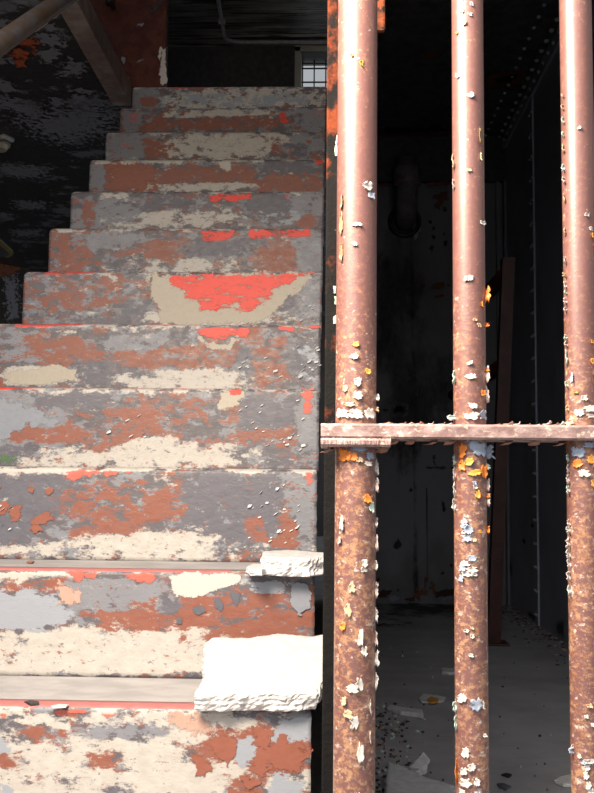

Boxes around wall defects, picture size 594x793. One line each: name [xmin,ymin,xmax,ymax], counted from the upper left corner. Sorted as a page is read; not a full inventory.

peeling [0,161,61,182]
peeling [103,161,155,192]
peeling [0,199,54,238]
peeling [1,273,23,324]
peeling [2,364,77,386]
peeling [0,395,60,443]
peeling [0,501,22,530]
peeling [30,512,55,534]
peeling [169,564,266,615]
peeling [290,582,312,616]
peeling [191,734,238,777]
peeling [228,726,313,793]